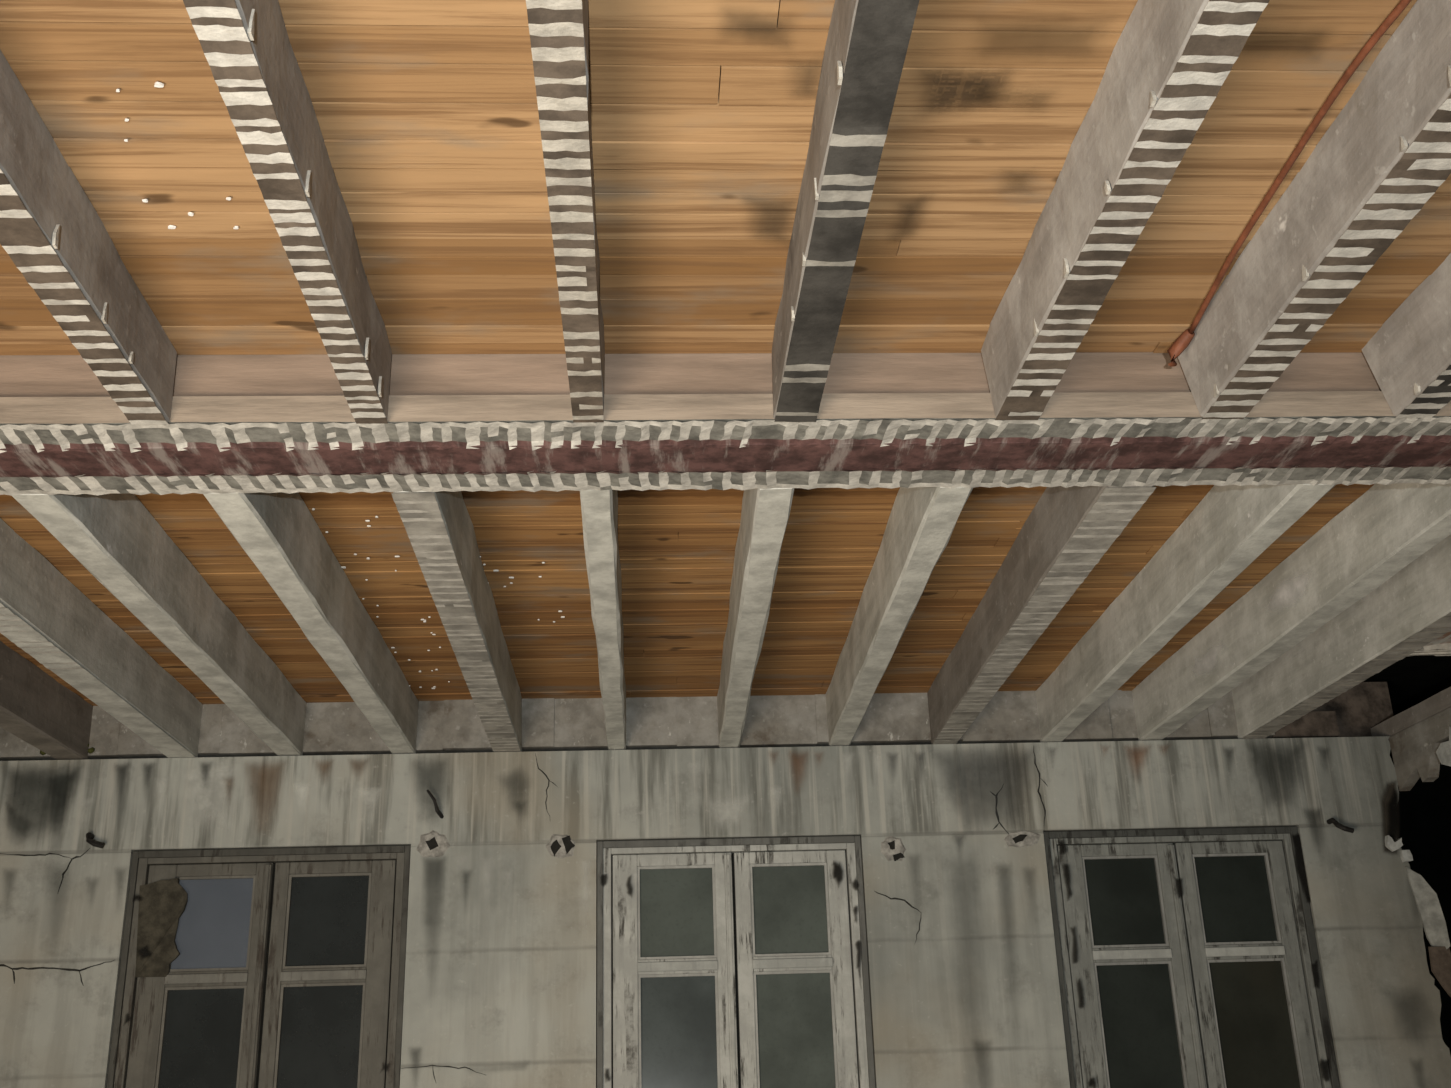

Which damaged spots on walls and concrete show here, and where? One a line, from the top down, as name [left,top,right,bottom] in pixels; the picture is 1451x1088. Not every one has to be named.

water stain [11,772,72,822]
spalling [1382,783,1398,852]
crack [0,848,90,892]
crack [875,891,921,945]
flaking render [1405,867,1451,997]
crack [0,960,114,986]